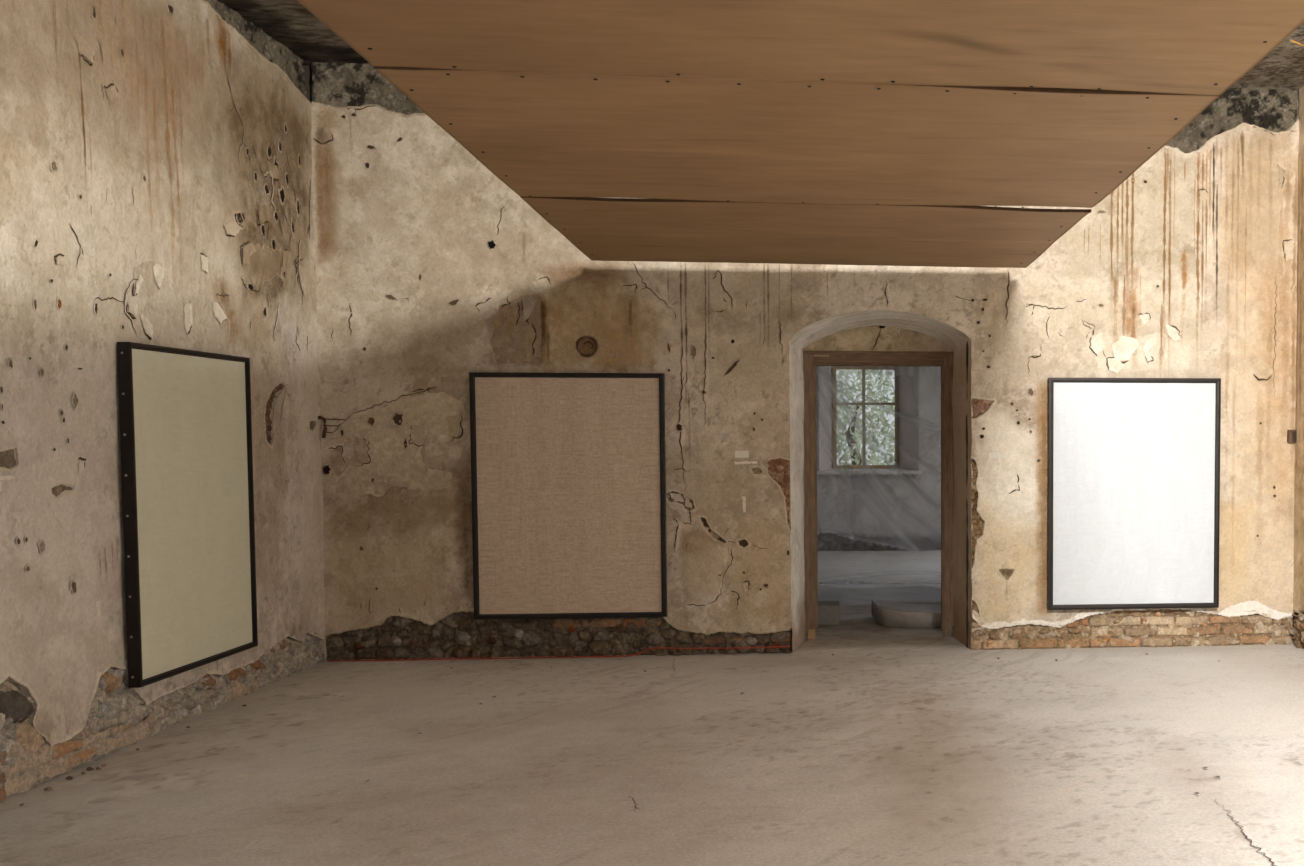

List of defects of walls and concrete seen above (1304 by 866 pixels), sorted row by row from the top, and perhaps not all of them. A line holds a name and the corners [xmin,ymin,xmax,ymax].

flaking render [167,0,427,119]
flaking render [1158,87,1298,202]
corrosion [1110,173,1137,338]
corrosion [1160,152,1211,360]
crack [632,261,747,490]
peeling [1079,313,1192,373]
crack [672,518,681,551]
crack [687,528,768,606]
flaking render [971,597,1304,650]
flaking render [0,607,791,803]
crack [1214,800,1280,866]